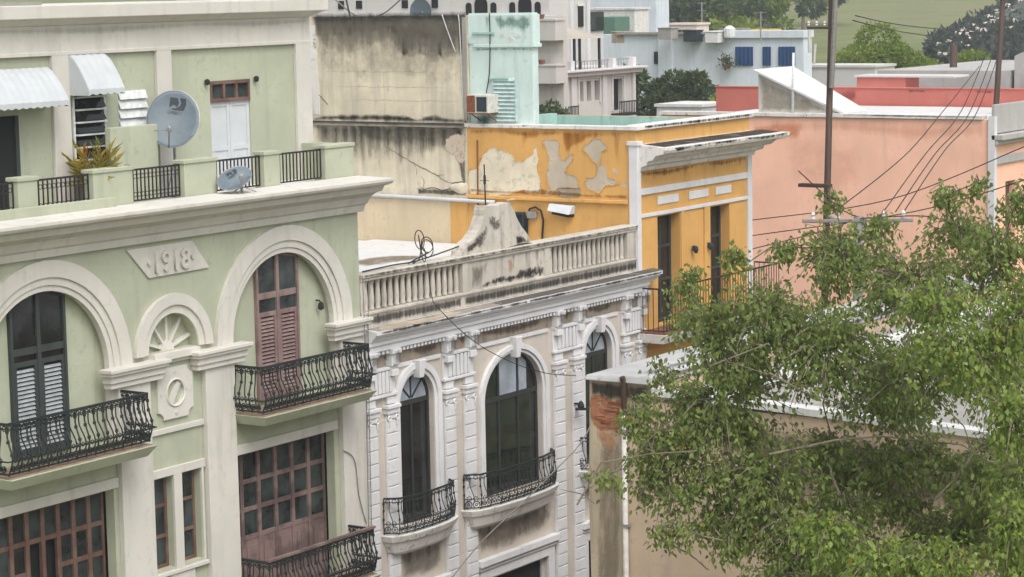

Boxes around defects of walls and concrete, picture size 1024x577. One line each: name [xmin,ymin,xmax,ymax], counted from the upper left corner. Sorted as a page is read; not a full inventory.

leakage [314,13,464,46]
leakage [313,115,466,145]
crack [385,146,467,194]
peeling [445,134,627,201]
leakage [359,218,663,333]
spalling [590,395,639,434]